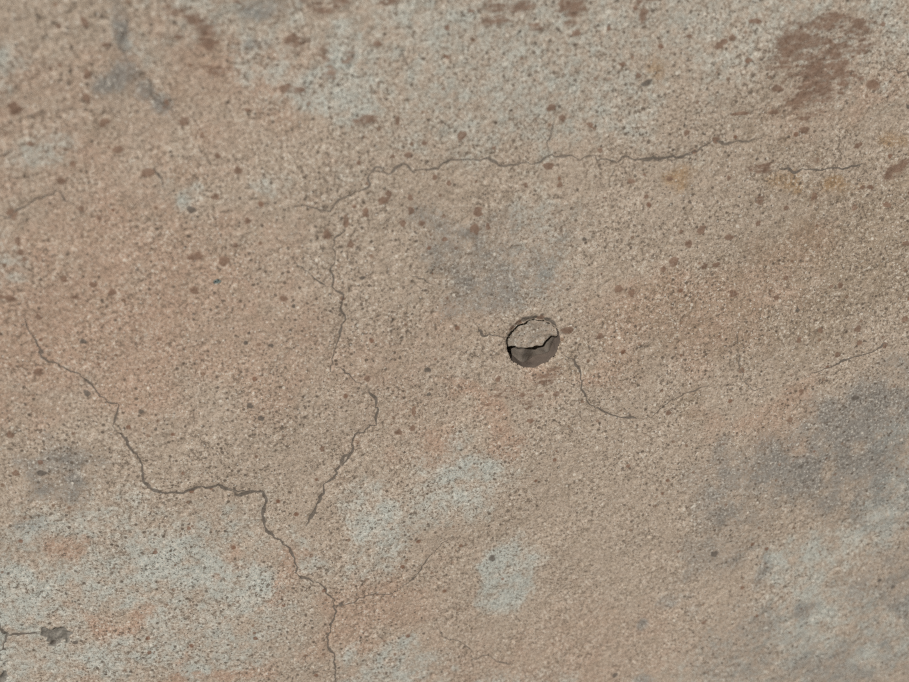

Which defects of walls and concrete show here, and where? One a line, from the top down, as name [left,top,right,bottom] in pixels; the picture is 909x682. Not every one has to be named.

crack [115,0,182,120]
crack [770,163,866,175]
crack [0,189,80,219]
crack [285,111,761,527]
spalling [507,313,558,331]
crack [9,312,453,682]
crack [0,616,40,659]
spalling [38,623,79,649]
crack [429,627,527,681]